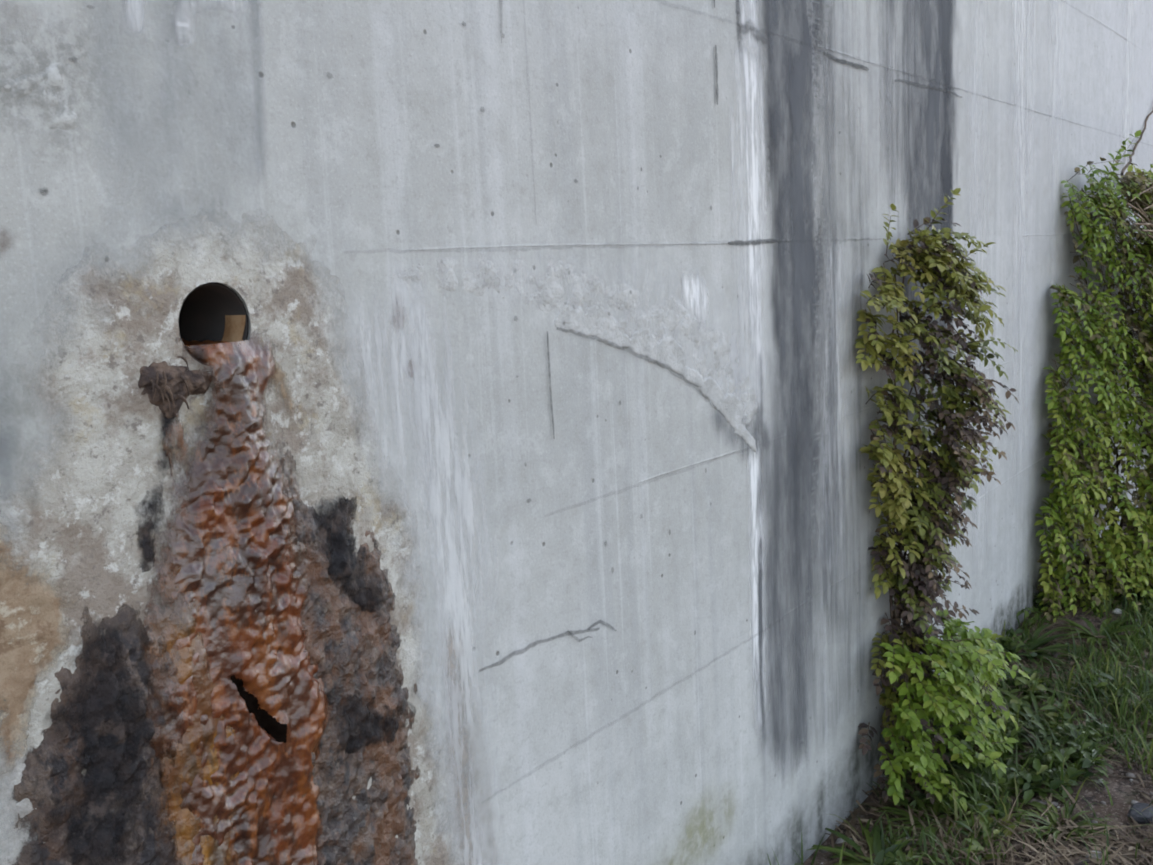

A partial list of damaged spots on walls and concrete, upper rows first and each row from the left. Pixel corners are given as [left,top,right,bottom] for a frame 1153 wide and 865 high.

rust [0,215,469,865]
leakage [731,0,842,743]
leakage [897,0,953,424]